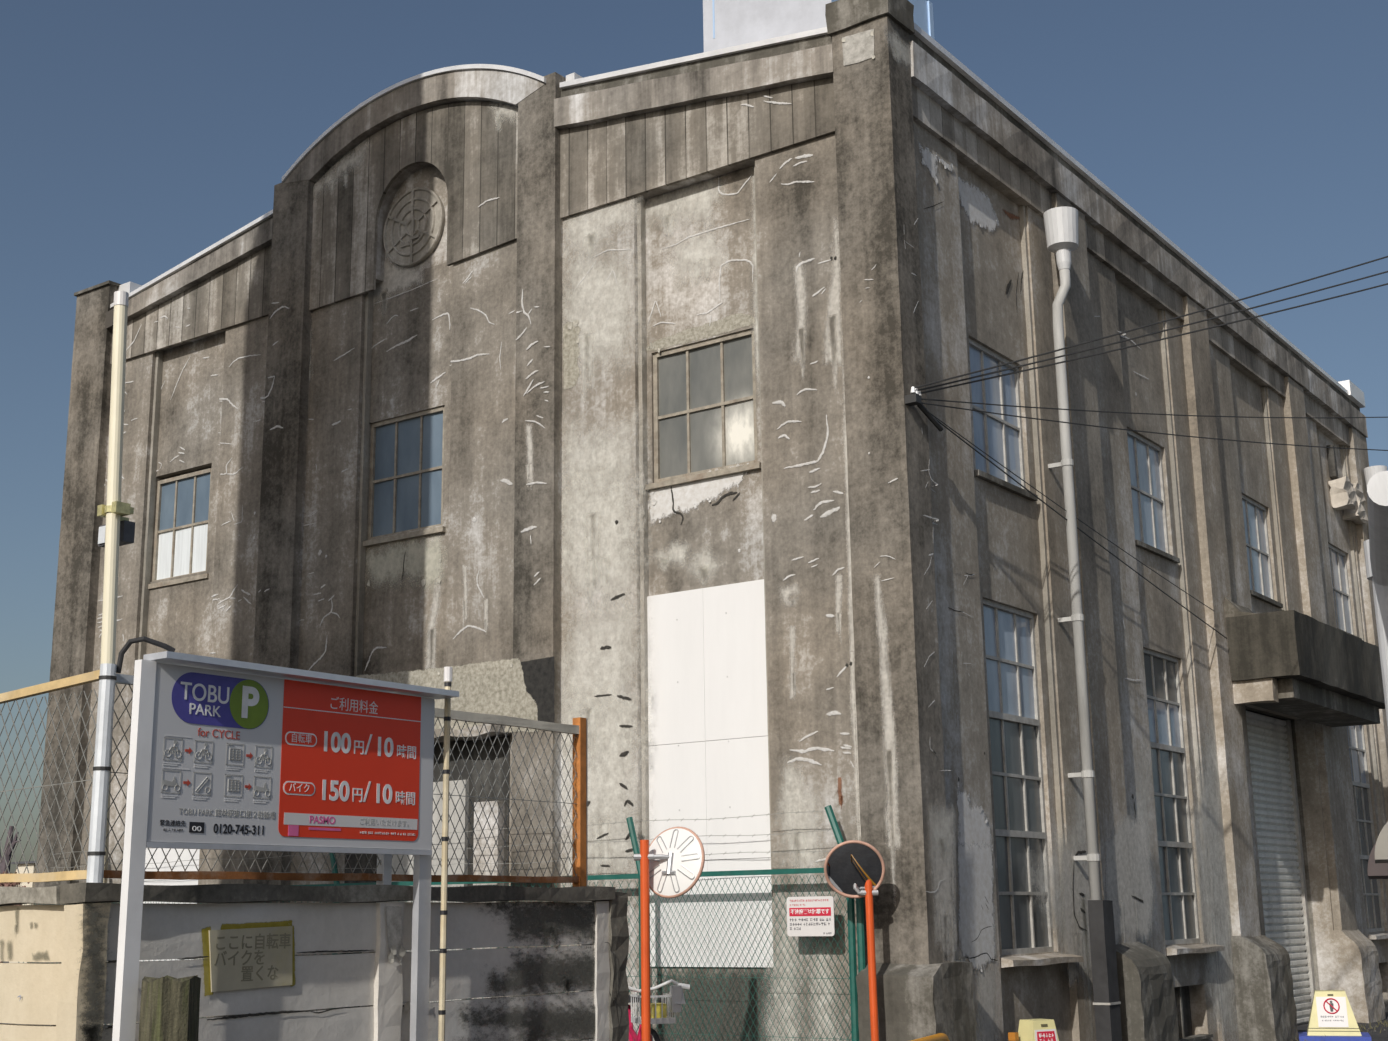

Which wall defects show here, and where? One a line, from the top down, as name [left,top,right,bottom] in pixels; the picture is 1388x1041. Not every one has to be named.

peeling [918,141,999,231]
peeling [648,463,748,523]
crack [671,486,740,525]
leakage [80,903,107,1041]